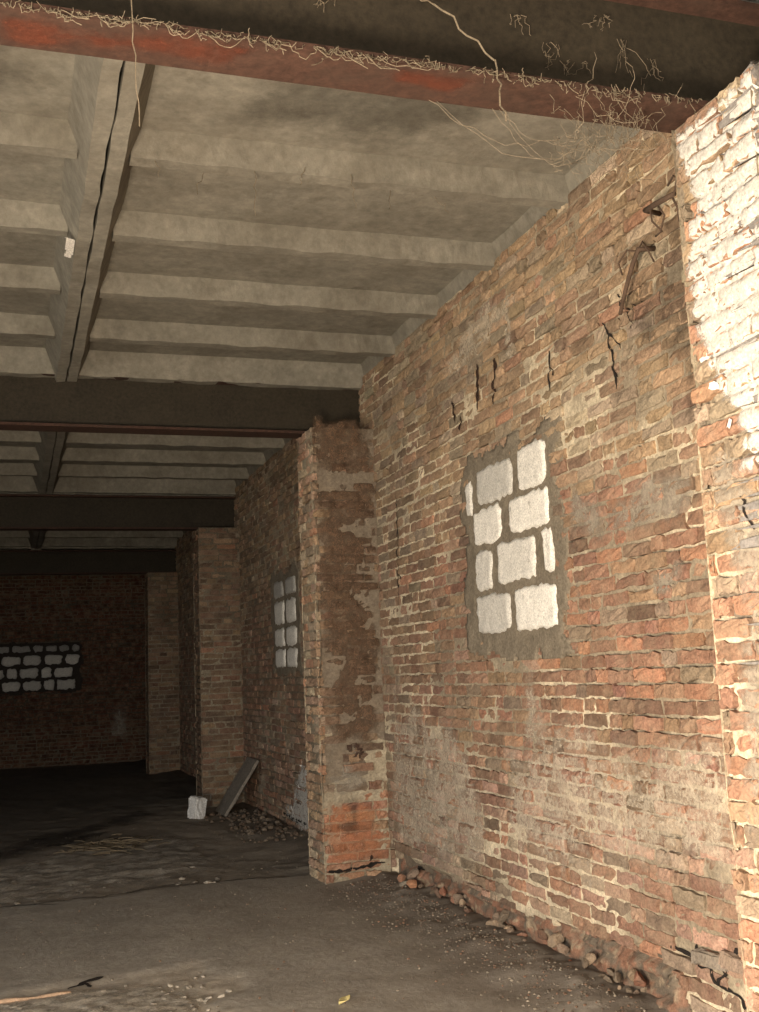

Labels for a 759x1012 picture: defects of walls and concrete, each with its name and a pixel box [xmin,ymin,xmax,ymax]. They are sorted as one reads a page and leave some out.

crack [546,351,554,390]
peeling [676,63,759,550]
spalling [312,420,382,765]
crack [670,944,747,1010]